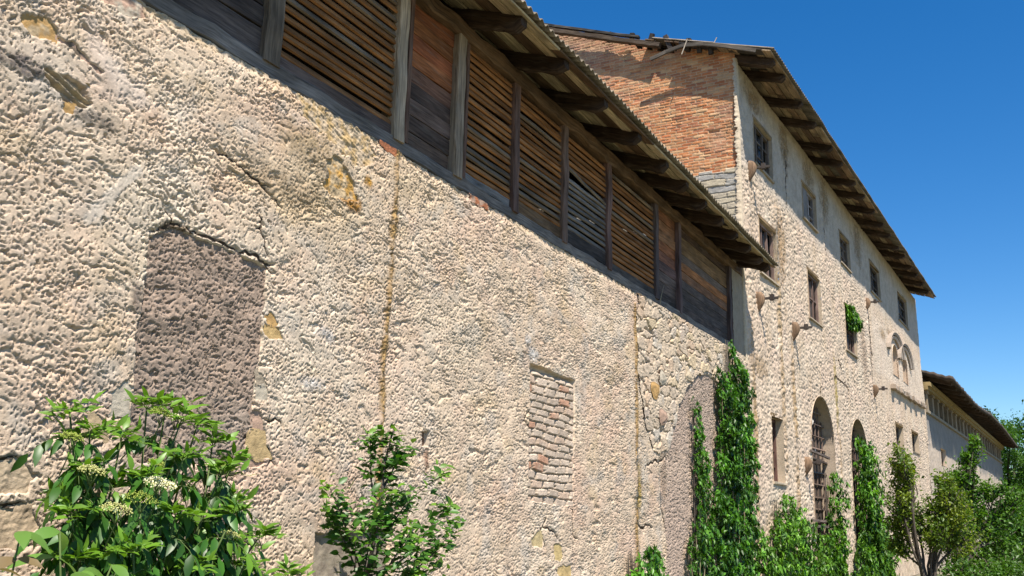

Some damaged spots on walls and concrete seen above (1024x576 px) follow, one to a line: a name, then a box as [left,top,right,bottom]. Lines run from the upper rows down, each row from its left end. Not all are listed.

flaking render [20,13,103,74]
flaking render [40,67,90,114]
crack [149,154,280,273]
flaking render [261,311,283,340]
flaking render [245,369,272,469]